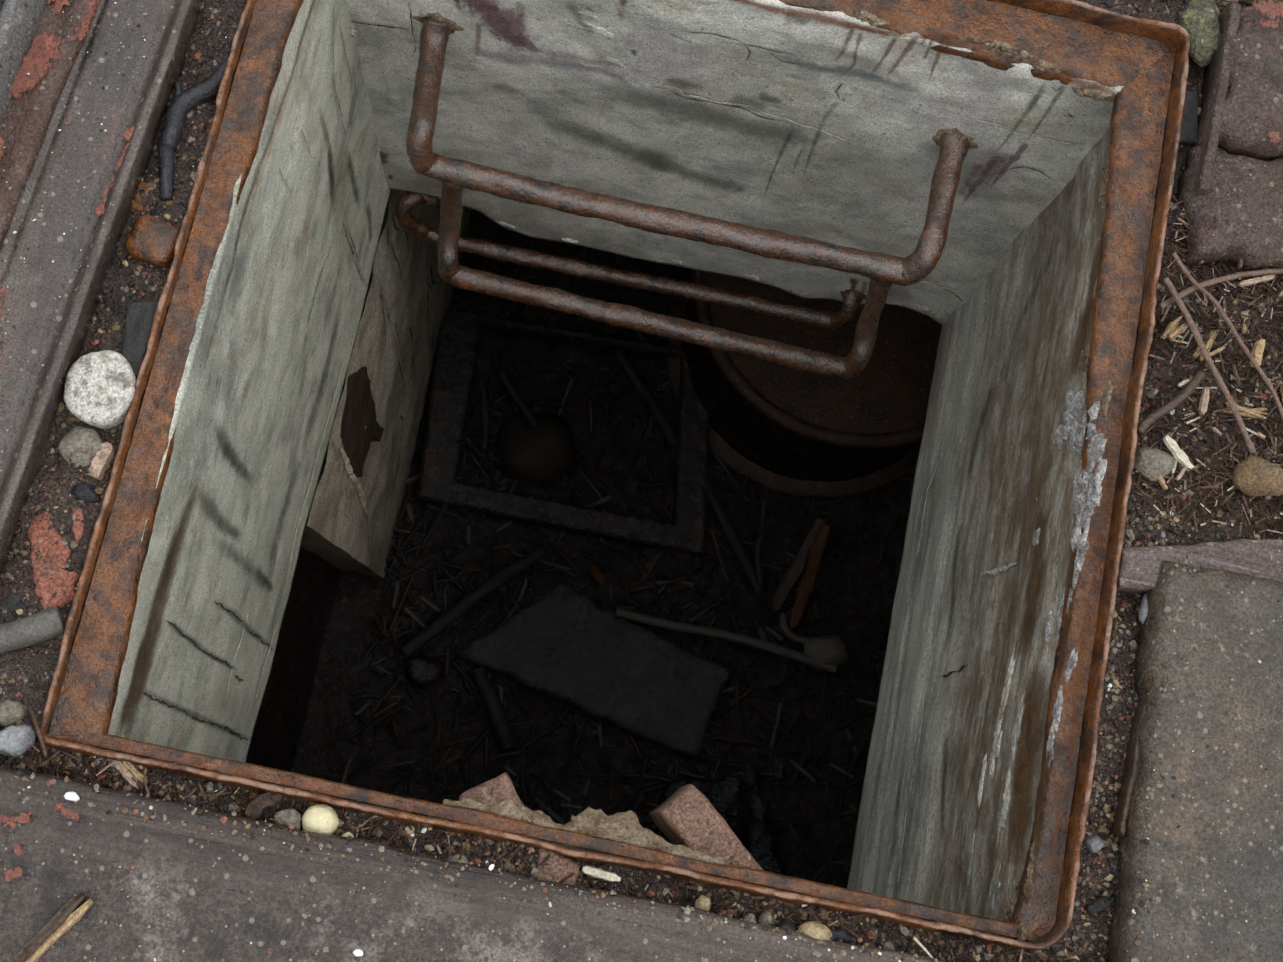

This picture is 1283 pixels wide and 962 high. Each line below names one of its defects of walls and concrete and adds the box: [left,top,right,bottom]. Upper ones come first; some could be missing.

peeling [10,14,90,98]
rust [454,0,539,53]
crack [685,31,799,65]
crack [653,84,846,141]
rust [739,0,975,73]
spalling [341,366,384,477]
spalling [1044,379,1114,645]
rust [124,500,192,723]
rust [1020,516,1047,645]
spalling [978,648,1026,831]
rust [1008,674,1061,882]
spalling [1046,648,1078,767]